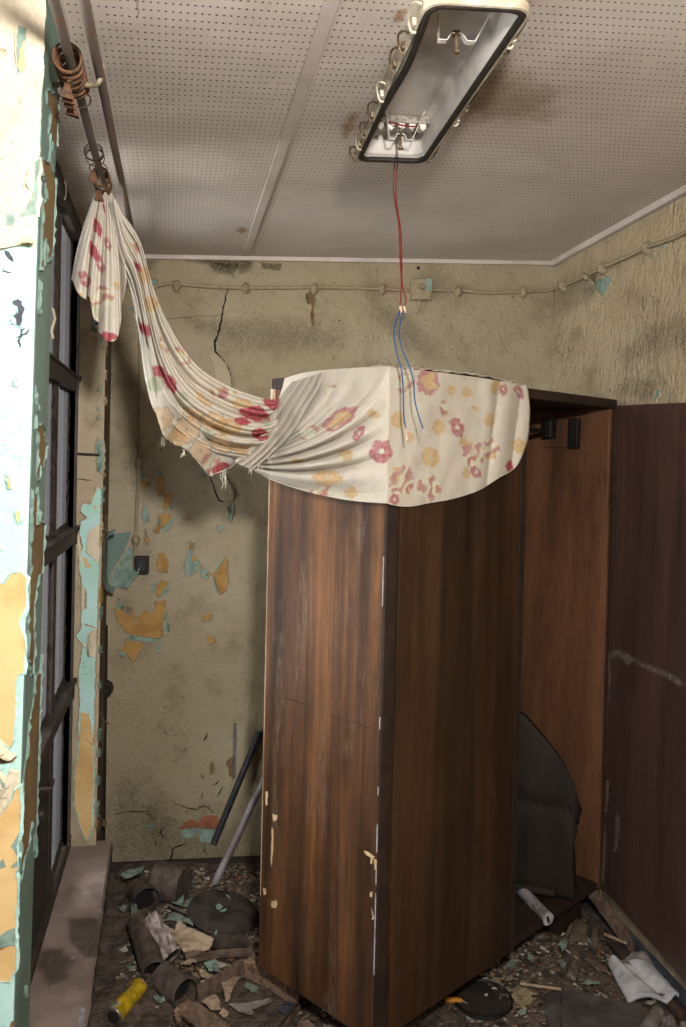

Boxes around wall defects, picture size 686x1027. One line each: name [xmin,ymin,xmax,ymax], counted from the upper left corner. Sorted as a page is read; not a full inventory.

peeling [0,0,60,329]
crack [168,289,232,386]
peeling [183,541,229,596]
peeling [0,385,49,984]
peeling [73,438,191,842]
crack [114,781,223,860]
peeling [177,813,220,844]